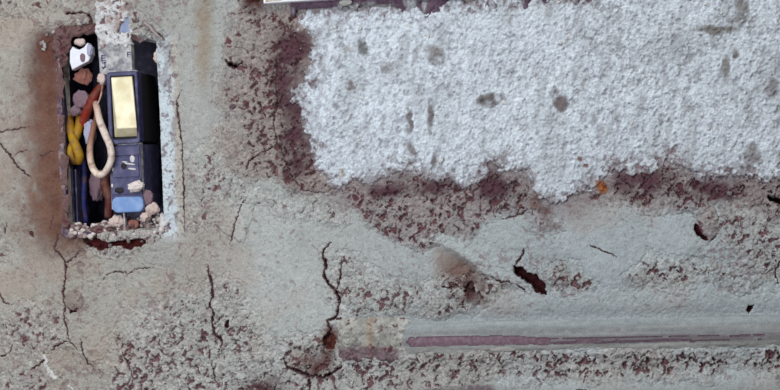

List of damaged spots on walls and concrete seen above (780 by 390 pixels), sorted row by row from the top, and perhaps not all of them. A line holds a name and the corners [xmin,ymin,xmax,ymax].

crack [0,126,53,178]
crack [176,90,186,232]
flaking render [178,0,780,300]
crack [31,215,94,370]
spalling [61,229,165,263]
crack [103,267,154,280]
crack [207,266,224,382]
crack [283,359,342,390]
crack [322,242,343,350]